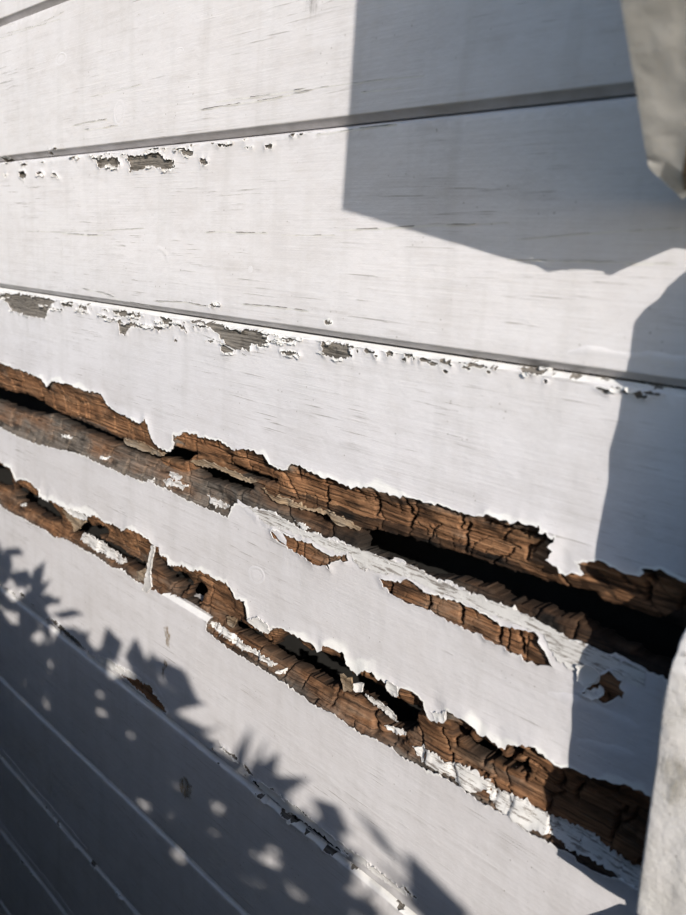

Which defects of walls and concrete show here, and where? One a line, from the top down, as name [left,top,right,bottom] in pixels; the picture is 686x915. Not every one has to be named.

peeling [3,148,79,179]
peeling [92,144,208,172]
peeling [316,337,506,374]
peeling [518,363,673,399]
peeling [147,471,189,491]
peeling [64,508,88,520]
peeling [208,495,230,509]
peeling [80,532,127,565]
peeling [247,616,270,633]
peeling [46,618,167,715]
peeling [212,747,417,910]